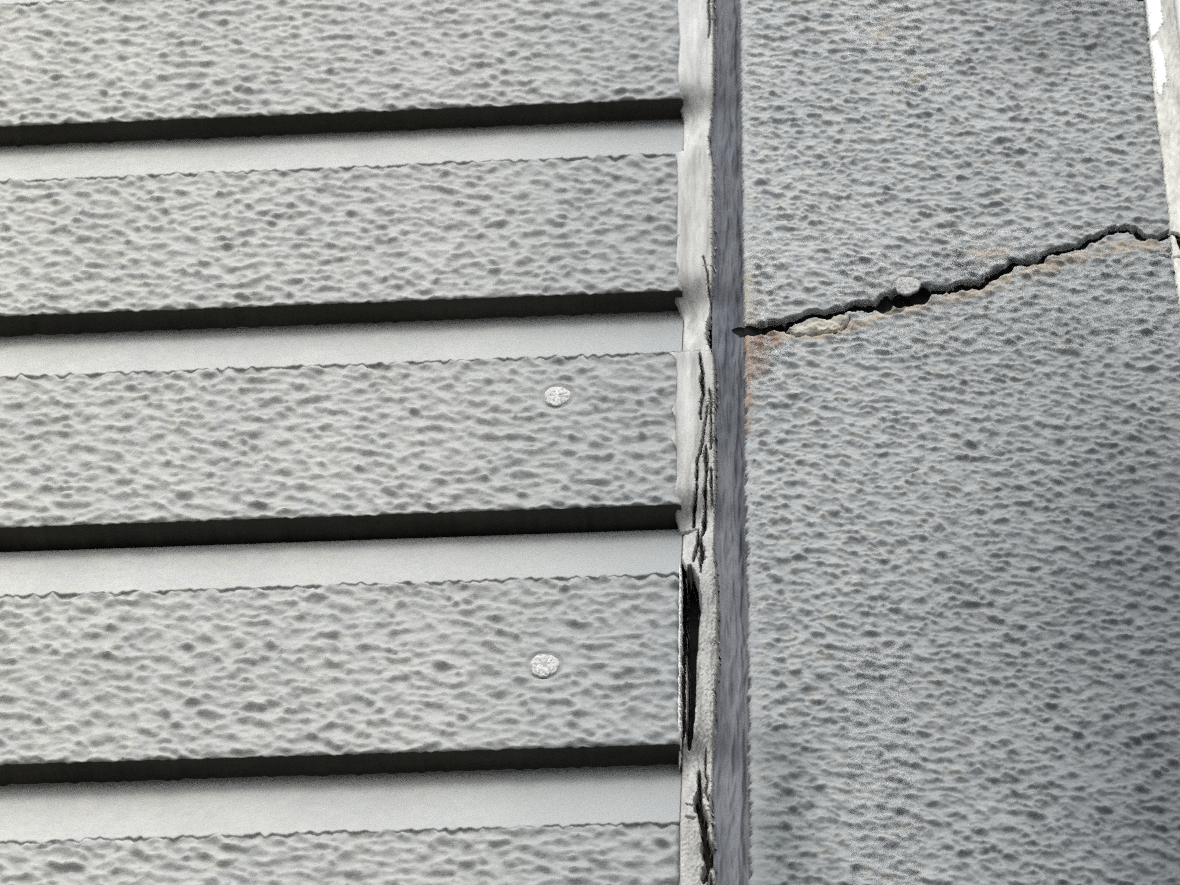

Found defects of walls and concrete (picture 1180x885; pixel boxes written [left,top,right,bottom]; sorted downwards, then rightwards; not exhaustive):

crack [706,230,1180,338]
crack [682,361,713,570]
crack [696,760,714,885]